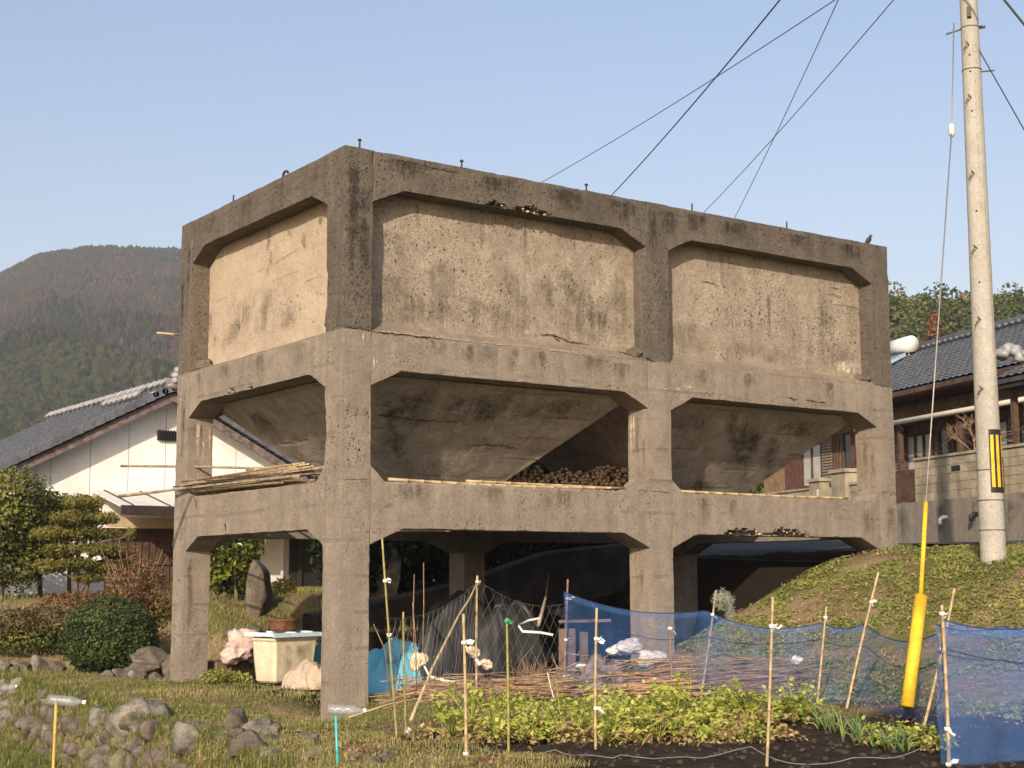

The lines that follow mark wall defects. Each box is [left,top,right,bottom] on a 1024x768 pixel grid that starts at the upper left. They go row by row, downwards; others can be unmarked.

leakage [350,168,367,256]
crack [345,327,442,340]
crack [542,334,590,345]